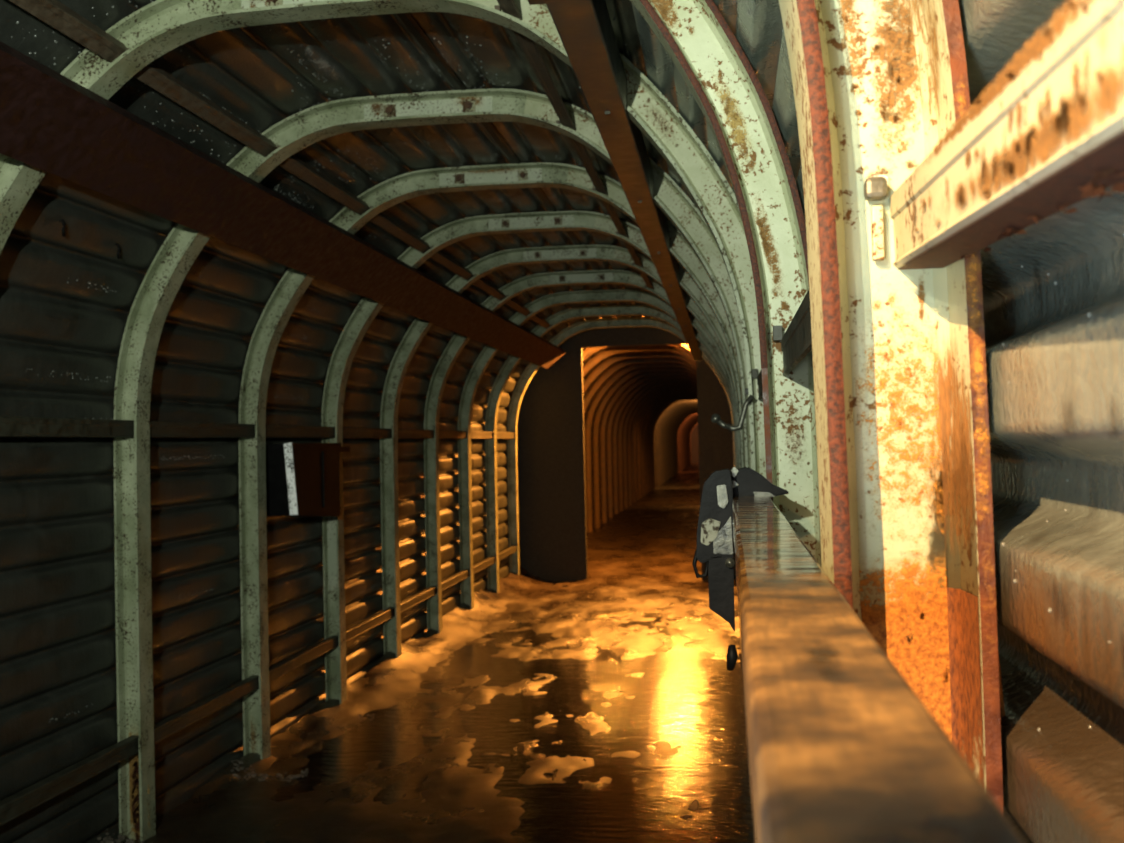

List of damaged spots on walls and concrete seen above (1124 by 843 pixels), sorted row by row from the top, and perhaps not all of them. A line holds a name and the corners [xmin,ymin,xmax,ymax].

rust [640,0,788,368]
rust [705,0,1124,786]